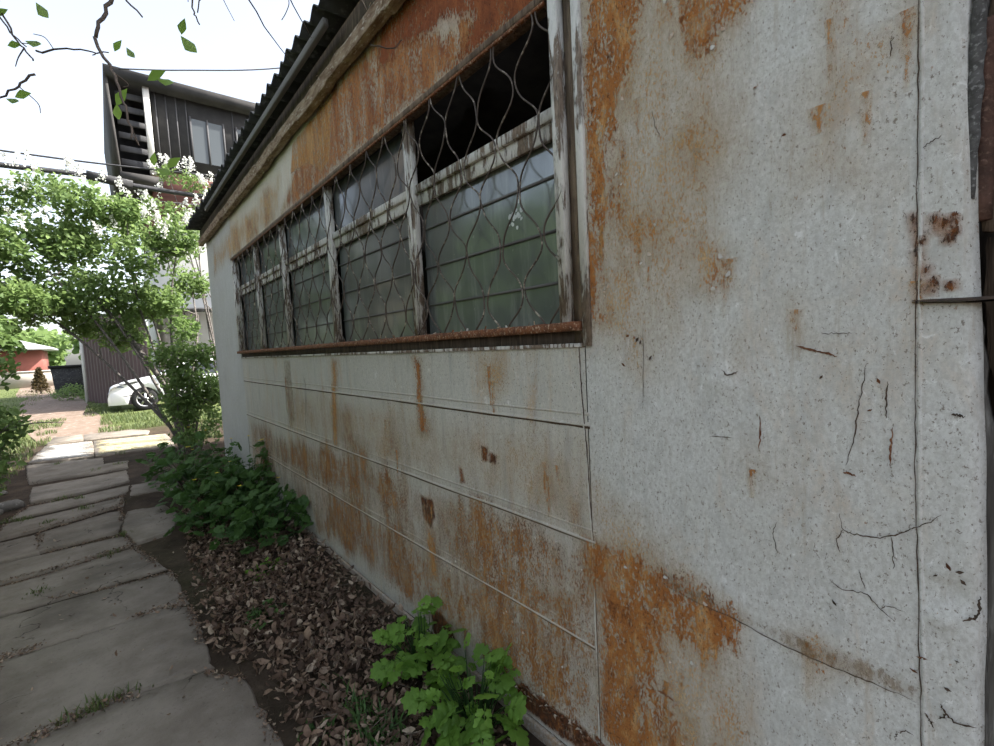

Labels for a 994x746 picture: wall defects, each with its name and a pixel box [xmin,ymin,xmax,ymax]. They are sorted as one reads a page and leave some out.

corrosion [581,0,753,370]
corrosion [253,355,750,746]